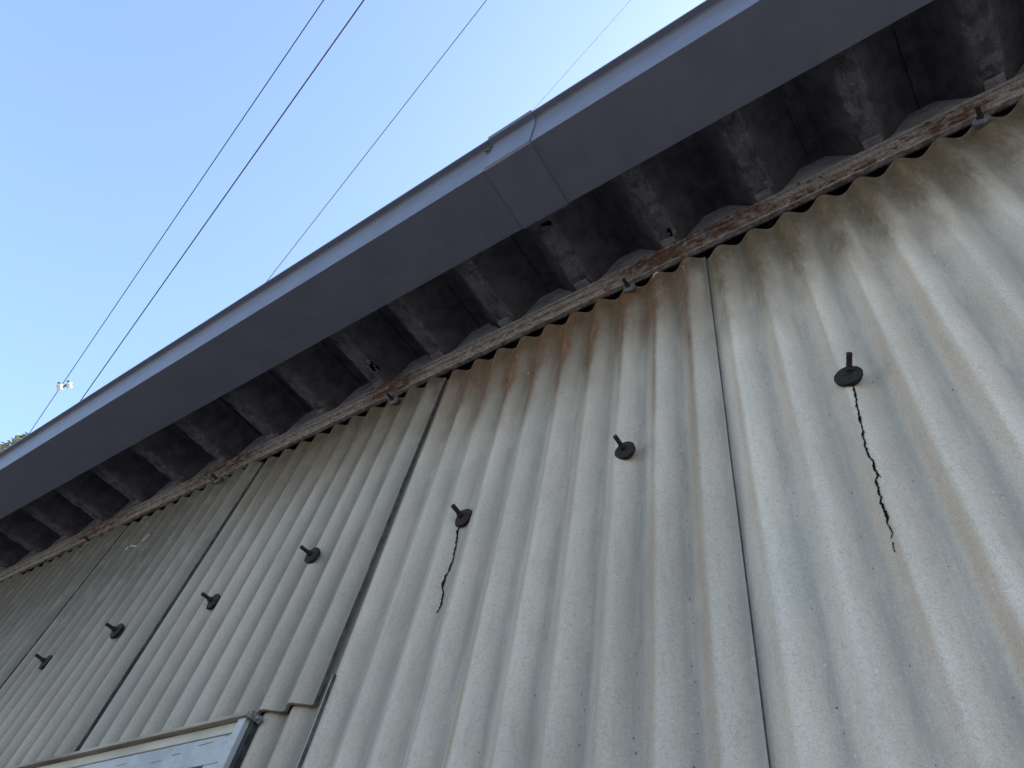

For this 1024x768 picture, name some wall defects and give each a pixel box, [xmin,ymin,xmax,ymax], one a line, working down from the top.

corrosion [465,203,777,403]
crack [852,385,895,552]
crack [436,527,460,613]